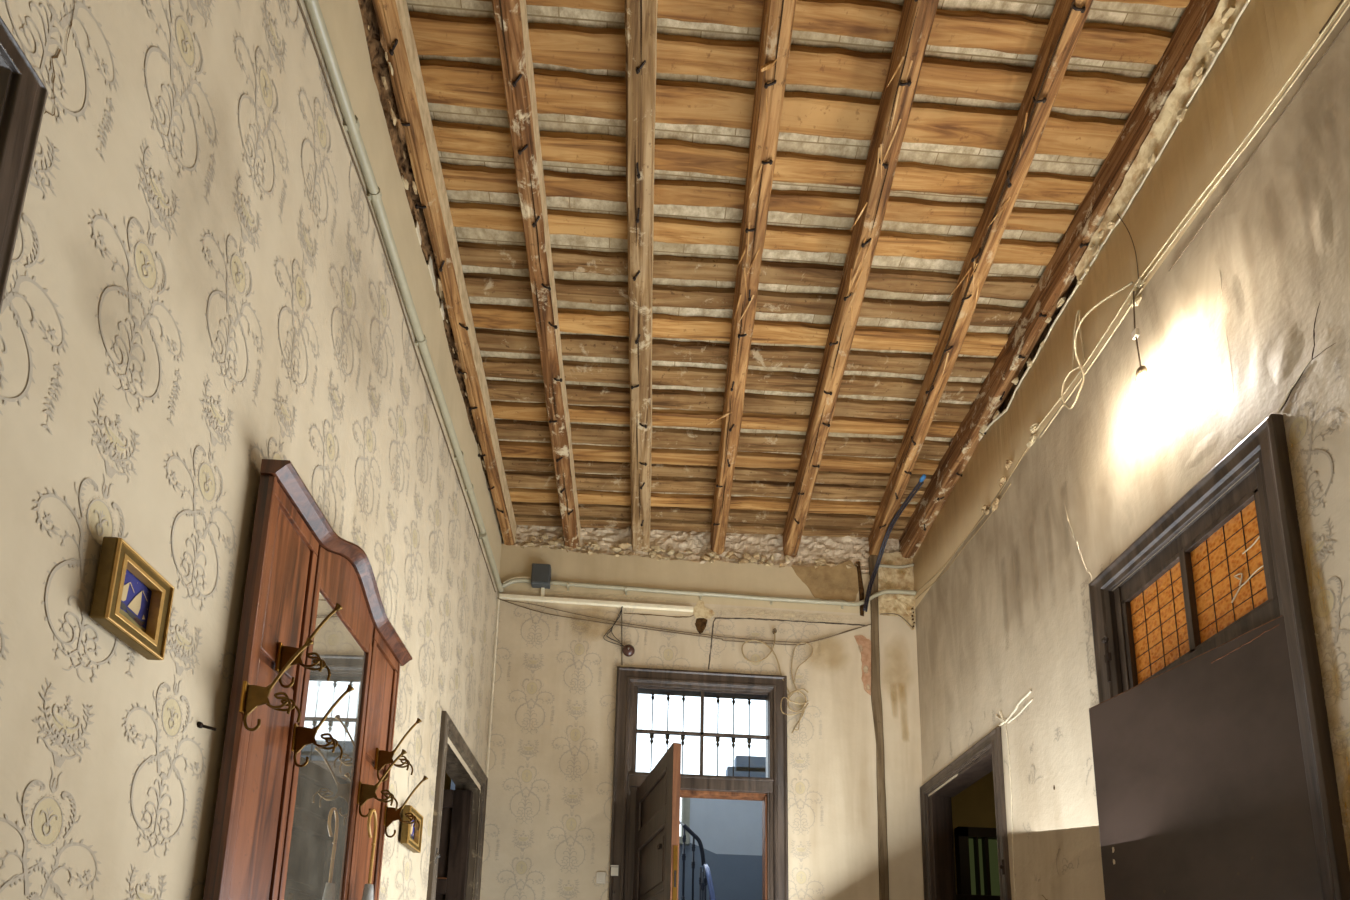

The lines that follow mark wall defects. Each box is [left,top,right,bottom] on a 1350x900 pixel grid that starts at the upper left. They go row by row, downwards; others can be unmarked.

crack [44,0,75,116]
flaking render [358,0,496,509]
flaking render [978,0,1250,441]
flaking render [501,525,916,634]